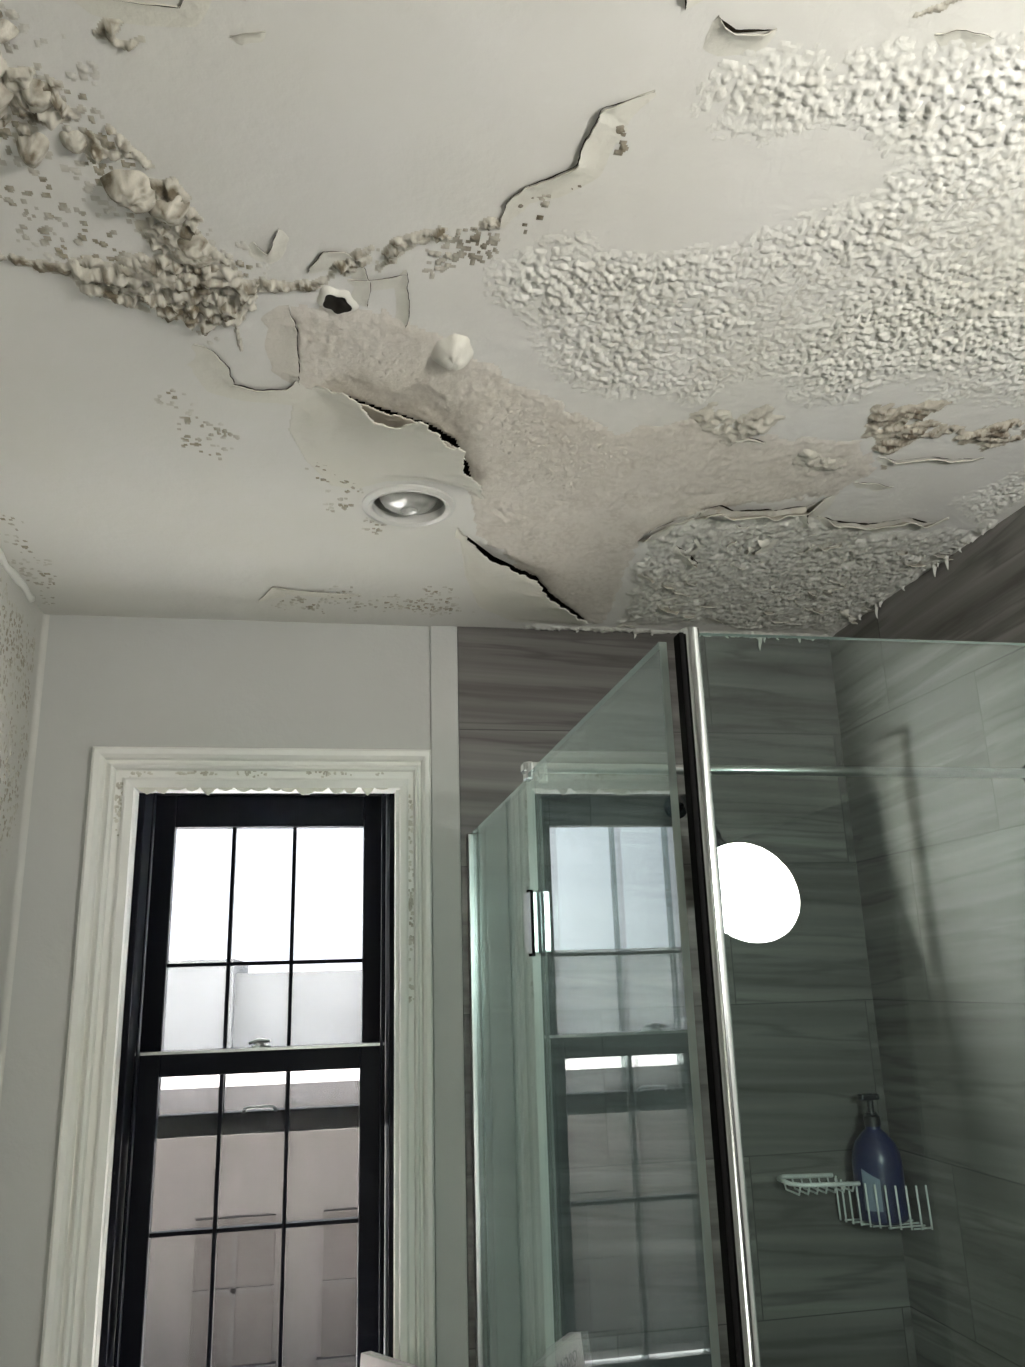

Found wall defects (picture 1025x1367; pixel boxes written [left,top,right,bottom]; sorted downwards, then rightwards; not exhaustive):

crack [249,90,656,328]
flaking render [186,286,971,633]